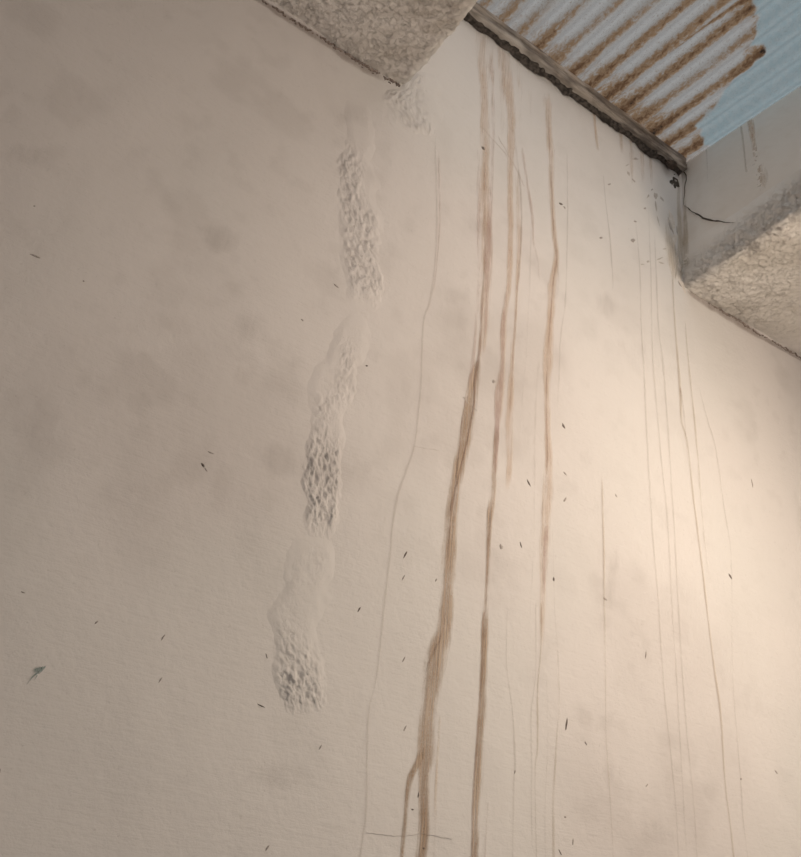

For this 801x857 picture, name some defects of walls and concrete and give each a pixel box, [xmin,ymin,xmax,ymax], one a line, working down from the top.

crack [683,172,734,223]